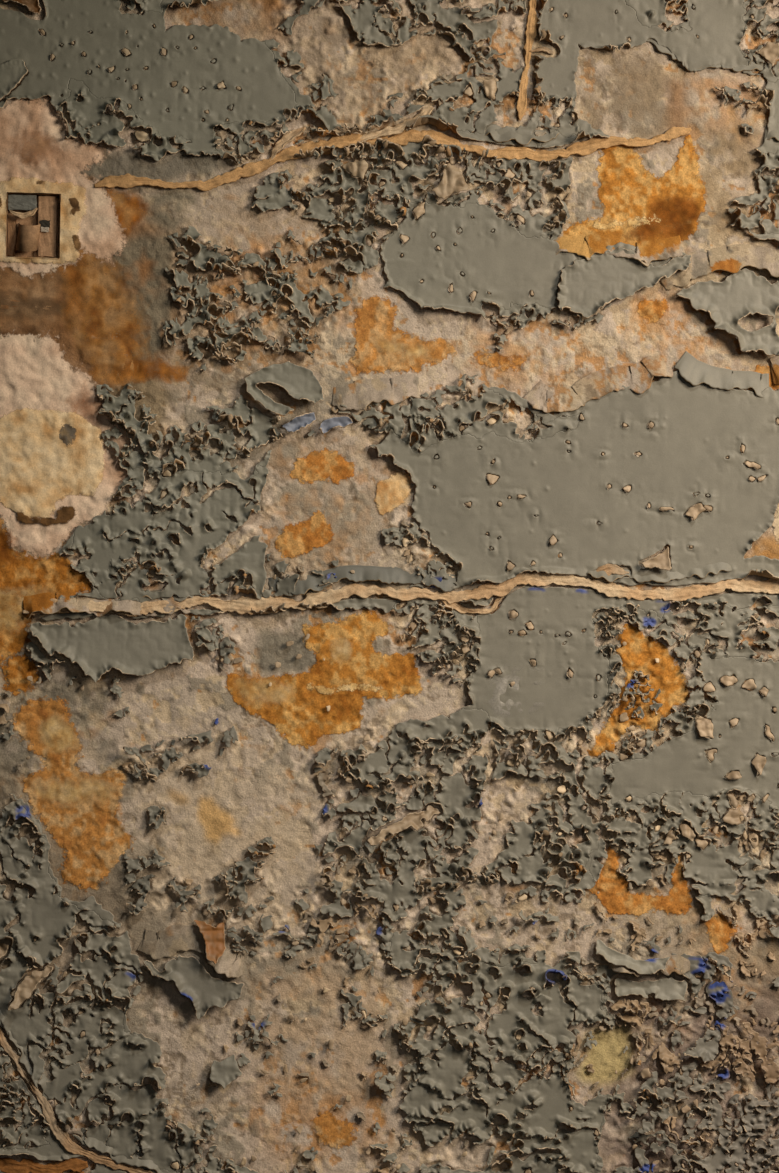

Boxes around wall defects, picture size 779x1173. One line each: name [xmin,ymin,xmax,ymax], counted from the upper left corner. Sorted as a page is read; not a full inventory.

crack [94,0,692,191]
corrosion [563,134,707,243]
peeling [0,0,779,718]
corrosion [349,295,457,375]
corrosion [471,348,525,372]
crack [23,564,779,617]
corrosion [0,518,136,892]
corrosion [226,608,423,749]
corrosion [587,623,689,757]
peeling [0,598,779,1173]
corrosion [588,847,693,917]
crack [0,1026,153,1173]